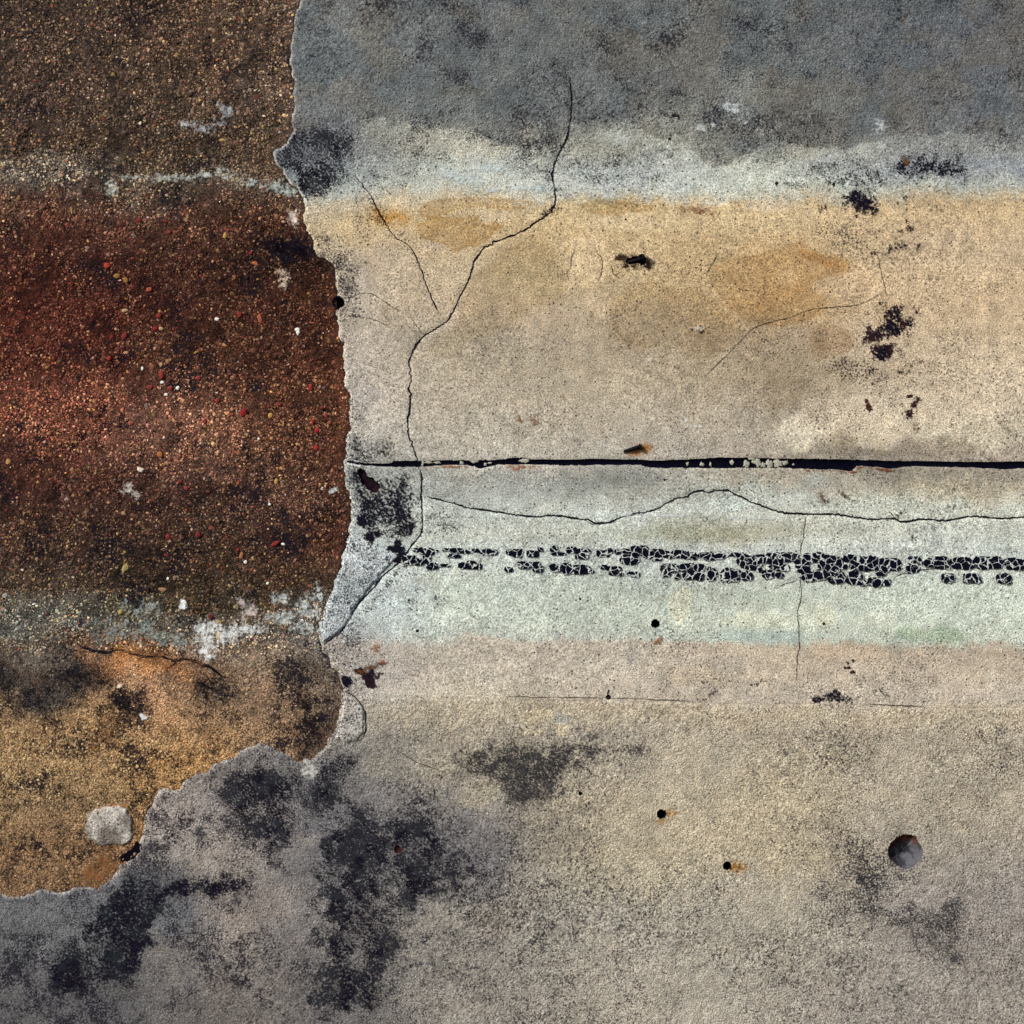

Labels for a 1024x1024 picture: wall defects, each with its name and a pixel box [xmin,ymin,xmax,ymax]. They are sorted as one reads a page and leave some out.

leakage [107,120,429,203]
leakage [783,154,968,220]
rust [614,248,660,270]
crack [324,80,1024,645]
leakage [826,292,925,413]
spalling [0,0,380,897]
leakage [347,431,462,614]
crack [776,579,802,681]
leakage [442,729,651,809]
leakage [205,689,487,1023]
spalling [888,834,923,870]
leakage [41,868,270,1004]